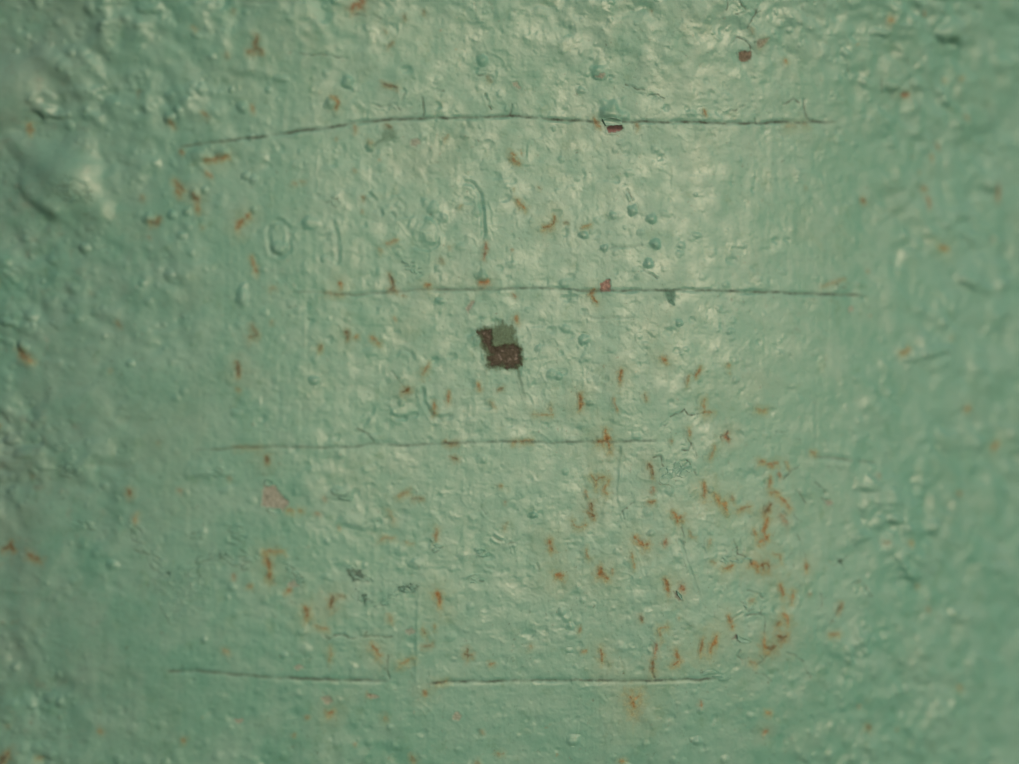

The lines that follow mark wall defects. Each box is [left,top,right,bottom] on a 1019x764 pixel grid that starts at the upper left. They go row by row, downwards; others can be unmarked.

crack [164,78,848,156]
peeling [602,117,625,134]
crack [265,215,877,304]
peeling [470,319,528,400]
corrosion [628,359,801,675]
crack [155,662,399,690]
crack [423,671,599,691]